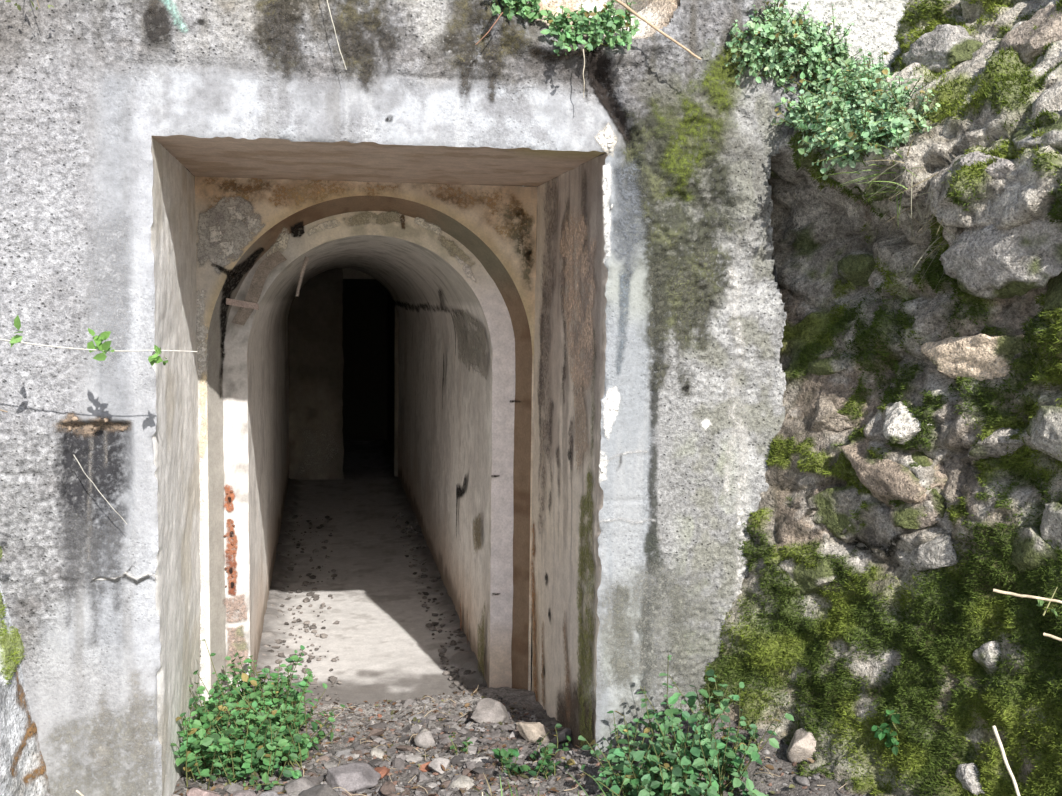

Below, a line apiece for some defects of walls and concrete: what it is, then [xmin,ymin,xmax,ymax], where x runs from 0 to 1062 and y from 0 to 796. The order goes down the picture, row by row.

damp [253,0,305,77]
damp [327,0,401,87]
damp [439,0,529,102]
peeling [197,196,265,274]
damp [614,47,750,427]
damp [59,426,127,608]
damp [724,374,748,595]
crack [91,570,155,584]
damp [556,619,595,748]